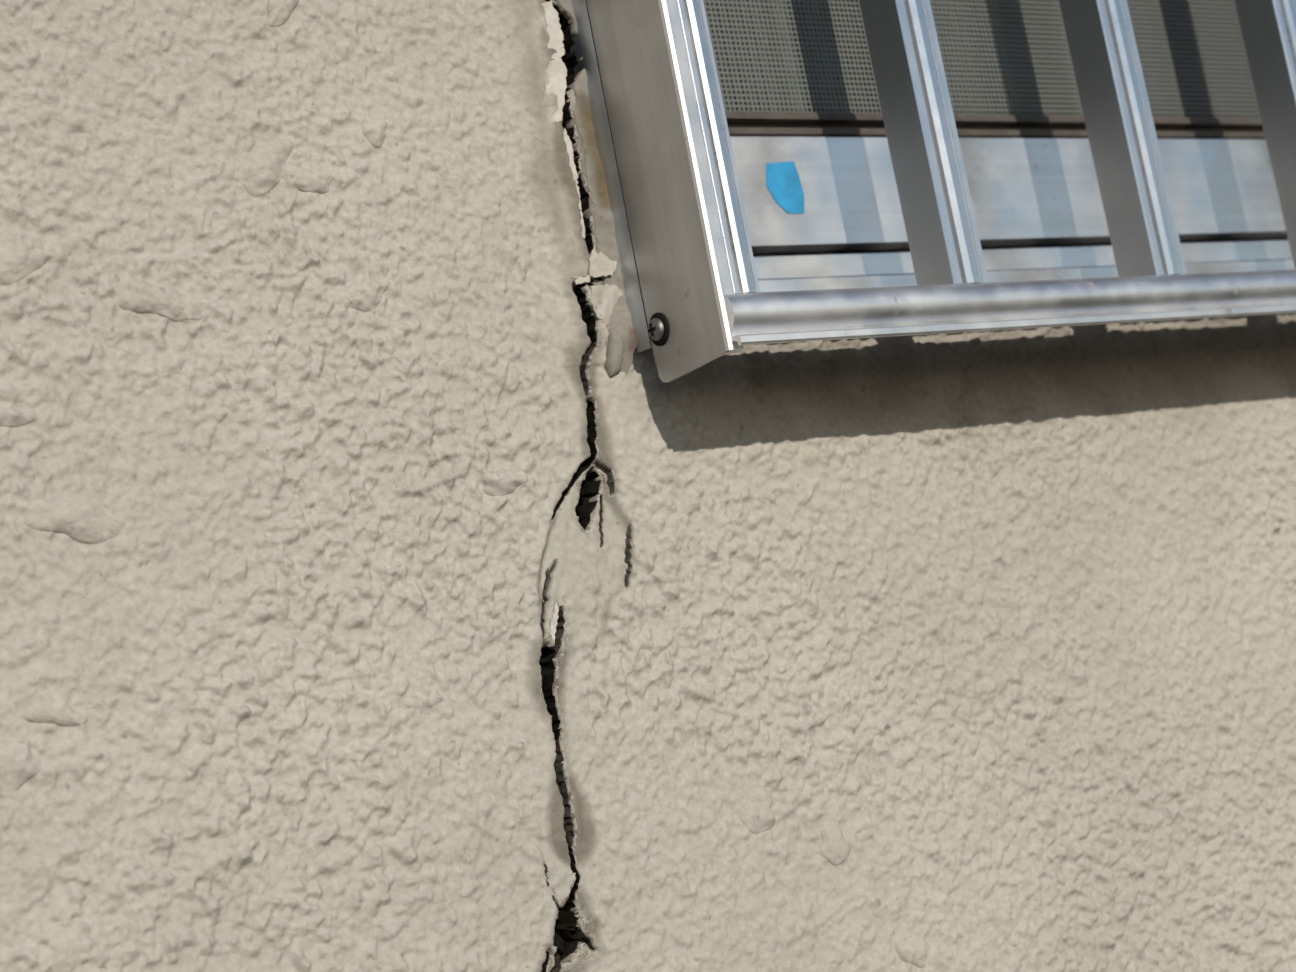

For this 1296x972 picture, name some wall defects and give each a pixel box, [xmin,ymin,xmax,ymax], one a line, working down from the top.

peeling [541,0,623,322]
crack [542,0,632,586]
spalling [539,462,633,654]
crack [536,561,595,972]
spalling [546,868,603,972]